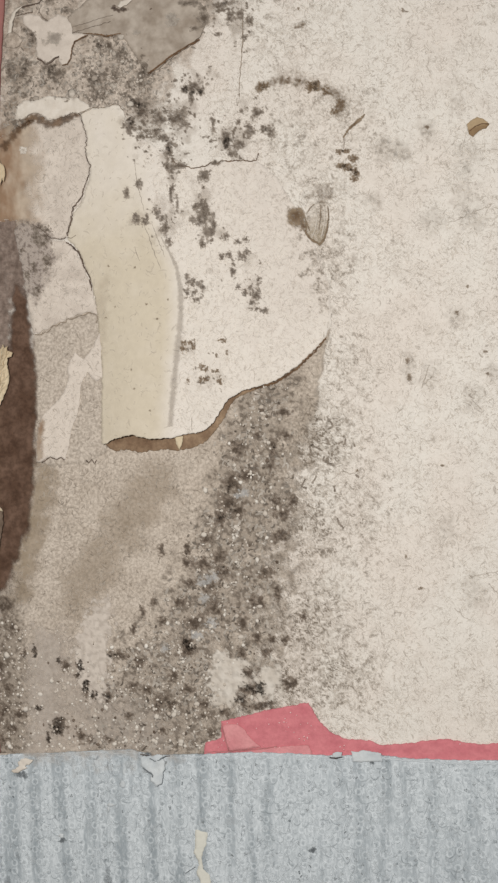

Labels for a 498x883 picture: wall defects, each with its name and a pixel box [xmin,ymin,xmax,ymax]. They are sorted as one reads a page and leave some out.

crack [31,113,92,291]
peeling [0,0,215,130]
damp [1,34,345,314]
damp [336,114,365,182]
peeling [0,220,26,405]
peeling [0,312,330,786]
damp [0,222,362,755]
peeling [193,830,211,883]